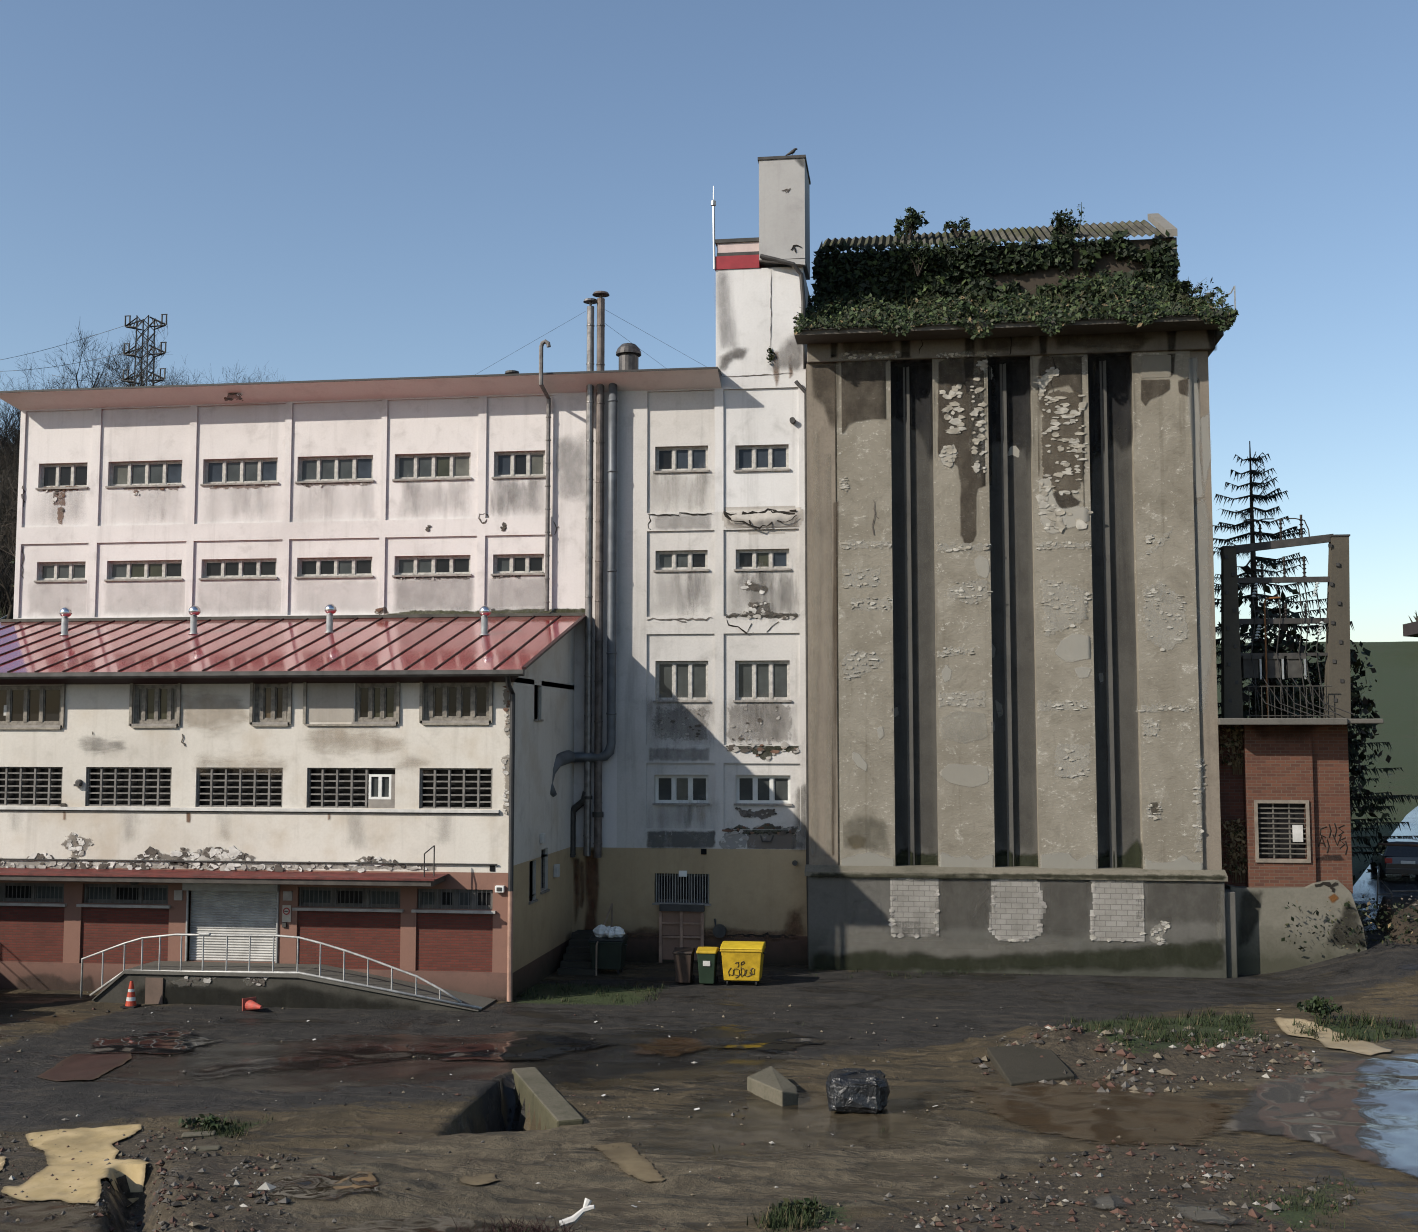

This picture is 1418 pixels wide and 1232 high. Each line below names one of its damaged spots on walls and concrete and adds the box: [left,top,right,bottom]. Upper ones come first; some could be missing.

leakage [720,277,745,368]
flaking render [936,351,996,474]
flaking render [1035,367,1093,550]
flaking render [726,580,798,619]
flaking render [726,704,800,761]
peeling [0,832,436,873]
peeling [719,807,797,849]
flaking render [824,879,1064,957]
flaking render [1089,880,1170,945]